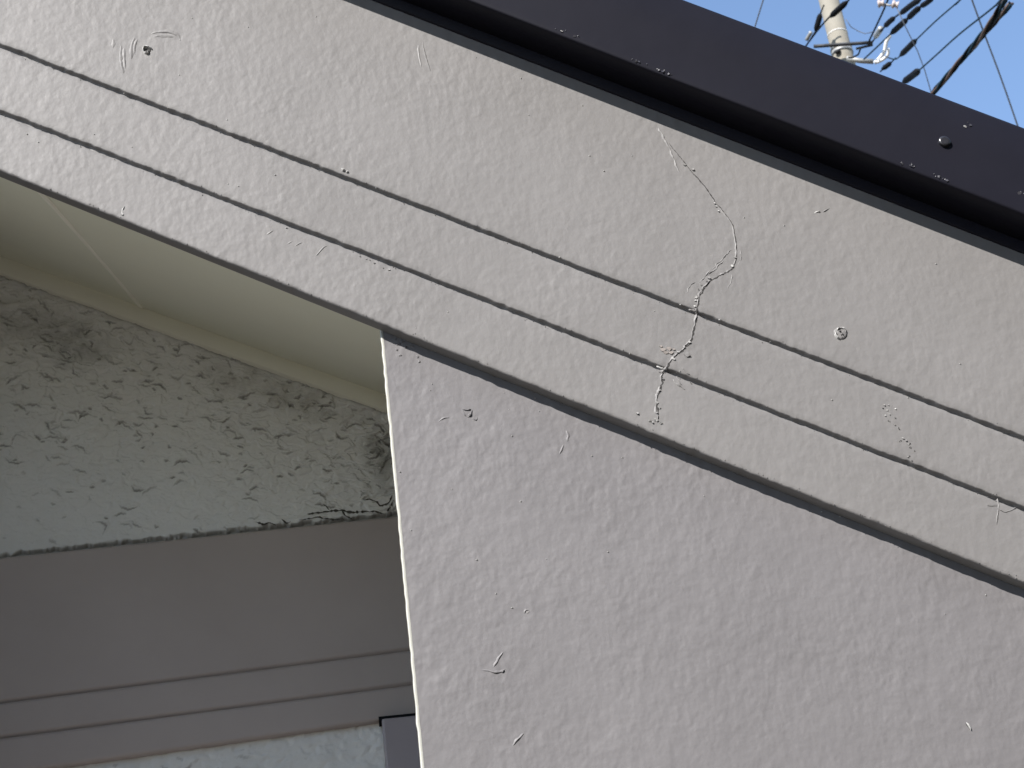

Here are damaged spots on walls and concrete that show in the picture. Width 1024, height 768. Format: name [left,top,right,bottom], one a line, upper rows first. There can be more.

crack [654,128,741,421]